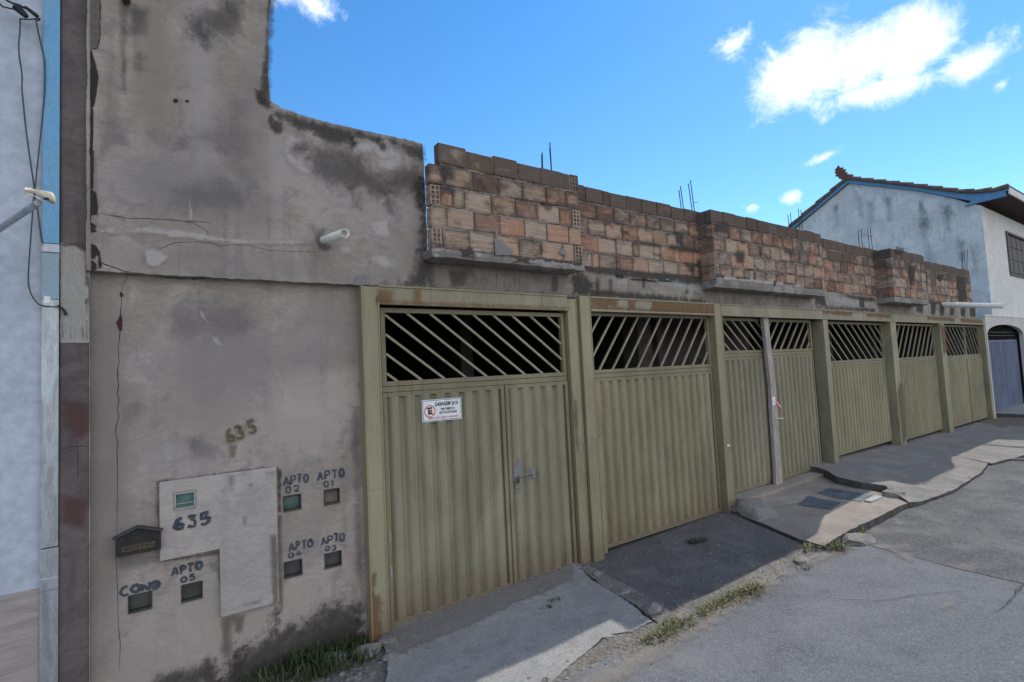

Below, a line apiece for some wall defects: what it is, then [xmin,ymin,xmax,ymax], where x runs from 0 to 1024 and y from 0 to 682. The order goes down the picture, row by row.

peeling [59,0,306,343]
crack [77,127,316,508]
damp [256,0,482,287]
damp [157,602,364,682]